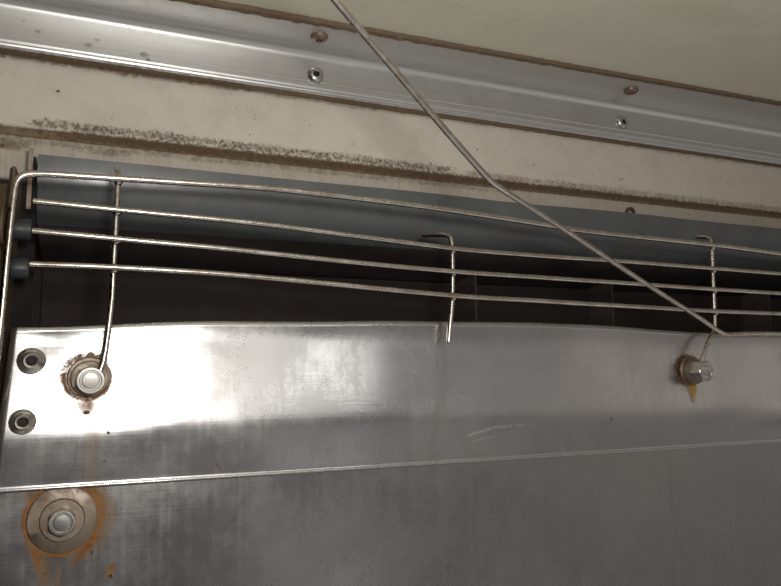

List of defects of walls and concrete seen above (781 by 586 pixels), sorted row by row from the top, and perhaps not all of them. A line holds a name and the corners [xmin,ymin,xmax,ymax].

leakage [33,118,780,217]
rust [59,351,112,415]
rust [675,354,696,400]
rust [22,487,105,561]